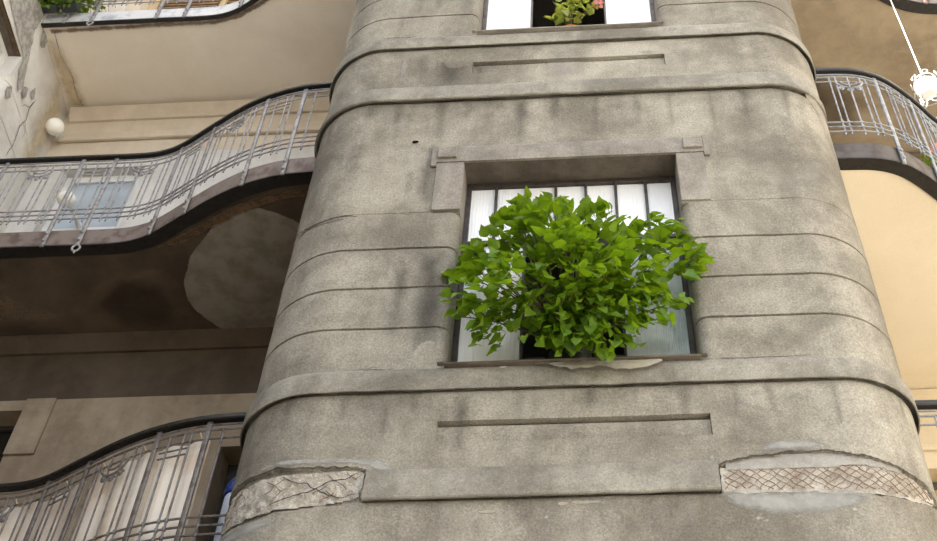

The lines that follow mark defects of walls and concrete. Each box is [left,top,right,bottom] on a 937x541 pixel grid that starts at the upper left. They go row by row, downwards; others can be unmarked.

peeling [157,189,308,248]
flaking render [220,459,393,541]
flaking render [711,441,937,522]